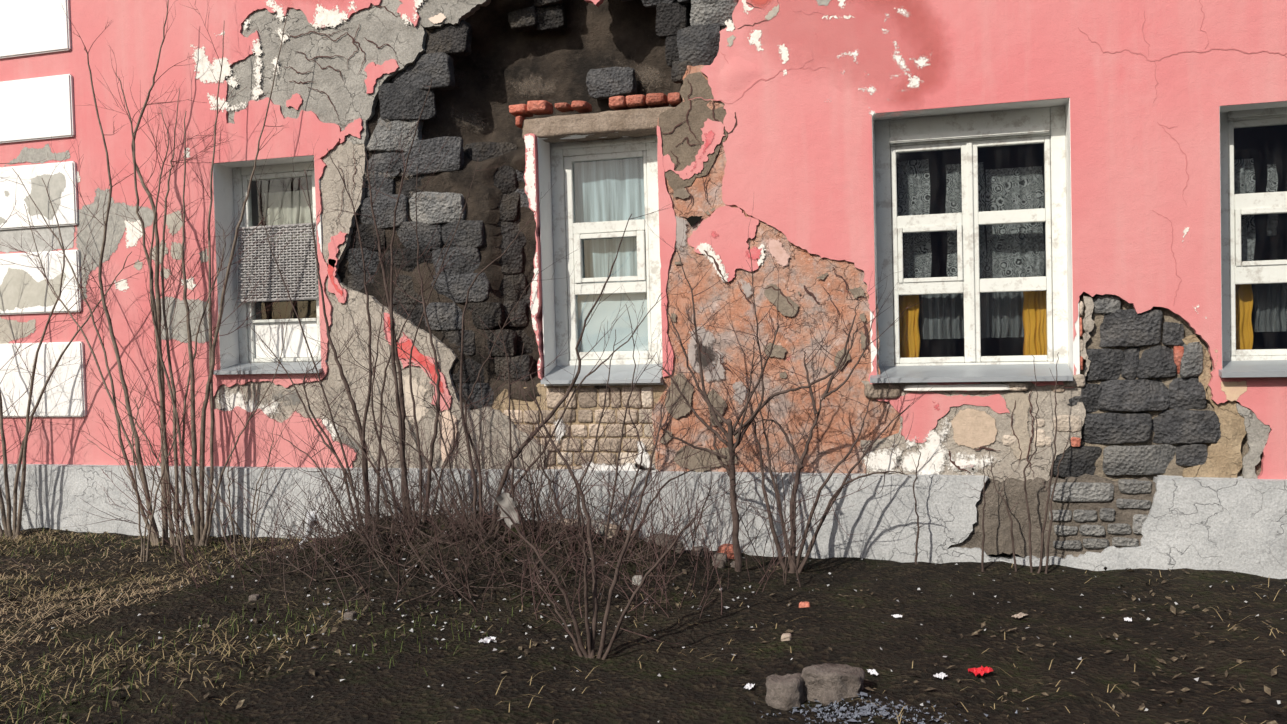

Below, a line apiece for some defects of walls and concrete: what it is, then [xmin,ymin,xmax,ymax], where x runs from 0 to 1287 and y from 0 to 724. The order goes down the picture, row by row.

peeling [0,143,209,344]
spalling [190,0,1271,559]
crack [1078,0,1287,306]